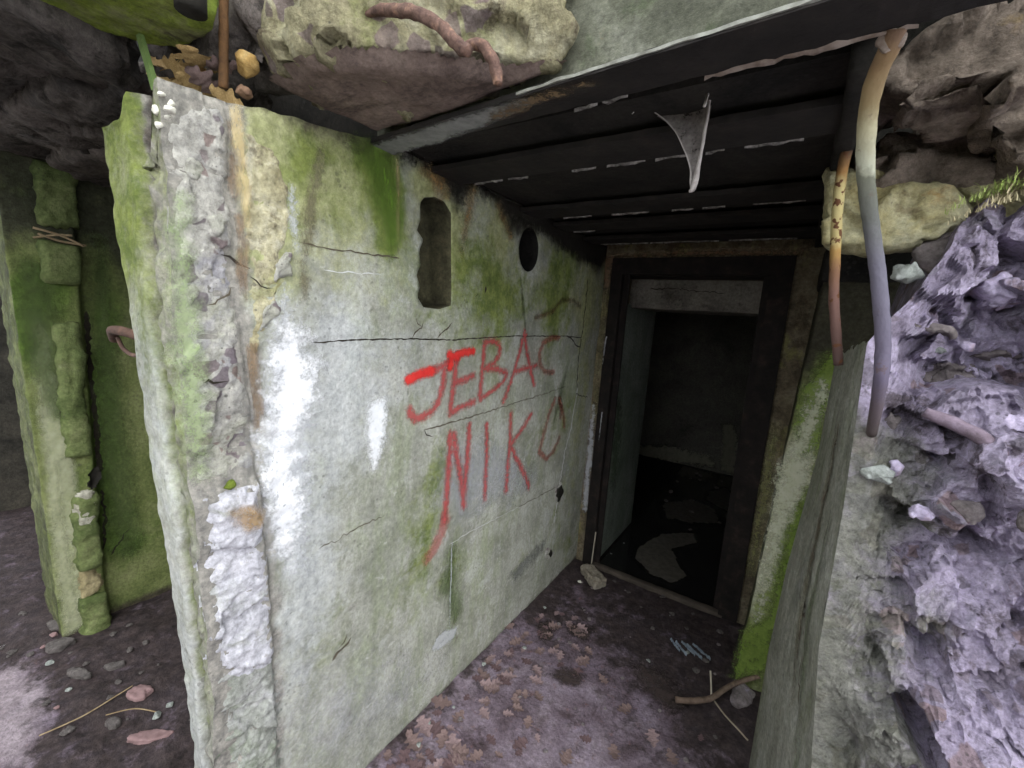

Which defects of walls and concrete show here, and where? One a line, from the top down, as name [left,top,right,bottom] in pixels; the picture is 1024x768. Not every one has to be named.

rust [227,106,251,287]
crack [303,243,398,275]
leakage [358,99,529,246]
leakage [572,154,686,172]
leakage [744,138,804,148]
spalling [160,107,293,768]
rust [247,343,264,428]
crack [311,281,603,549]
leakage [755,379,828,645]
crack [332,636,351,661]